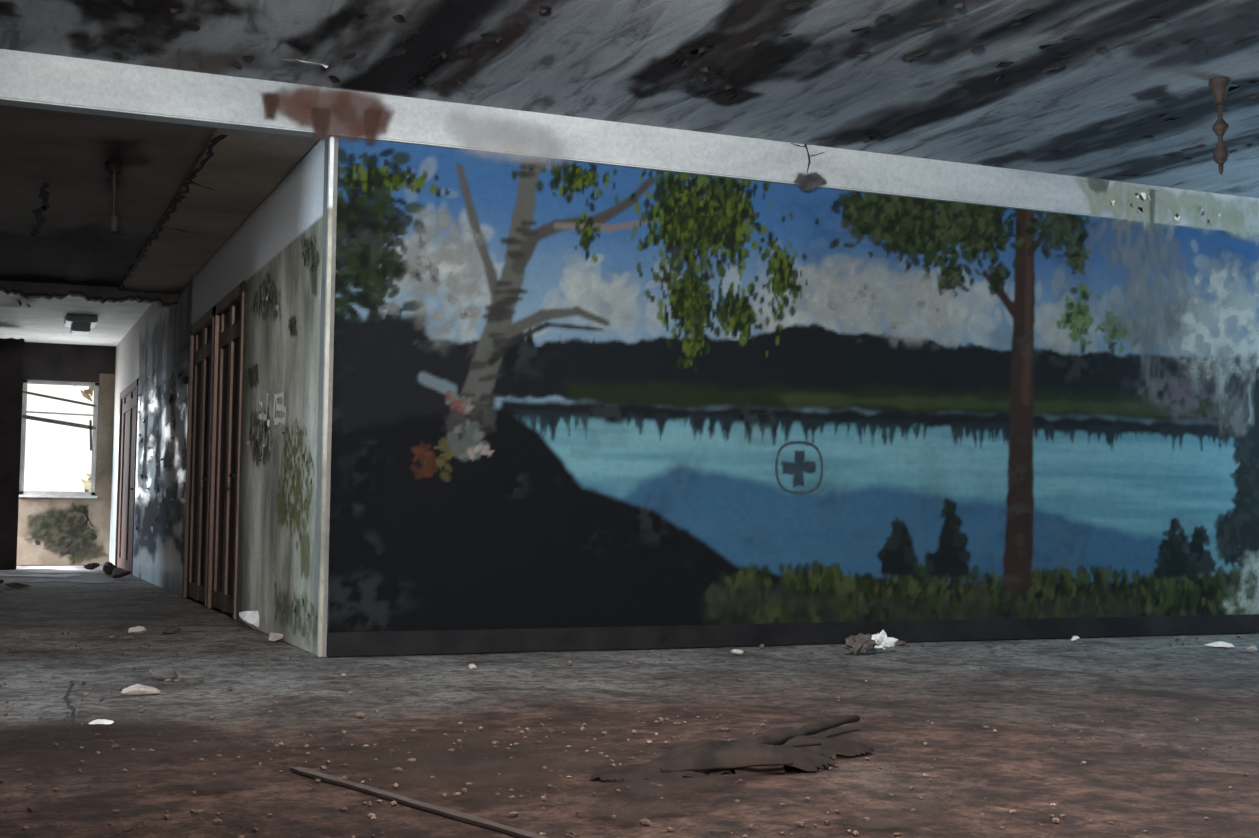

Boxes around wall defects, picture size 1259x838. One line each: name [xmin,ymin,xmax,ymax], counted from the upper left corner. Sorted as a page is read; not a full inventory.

leakage [0,1,18,16]
leakage [69,0,261,74]
leakage [323,0,422,83]
leakage [799,0,1210,147]
leakage [459,120,559,156]
leakage [982,78,1259,167]
leakage [794,173,826,191]
leakage [277,421,314,576]